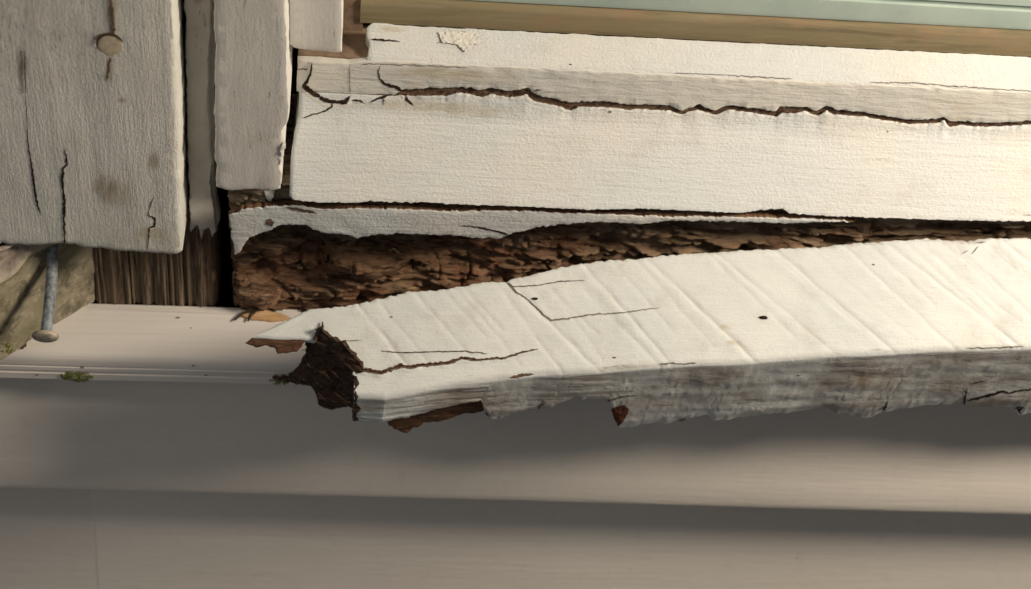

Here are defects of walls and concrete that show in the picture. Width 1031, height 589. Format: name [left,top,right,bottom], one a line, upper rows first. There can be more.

crack [96,0,122,82]
crack [297,38,1031,131]
crack [24,51,68,243]
crack [147,197,156,250]
crack [507,280,660,321]
crack [349,349,538,378]
peeling [351,375,361,421]
peeling [611,405,628,426]
crack [963,381,1031,414]